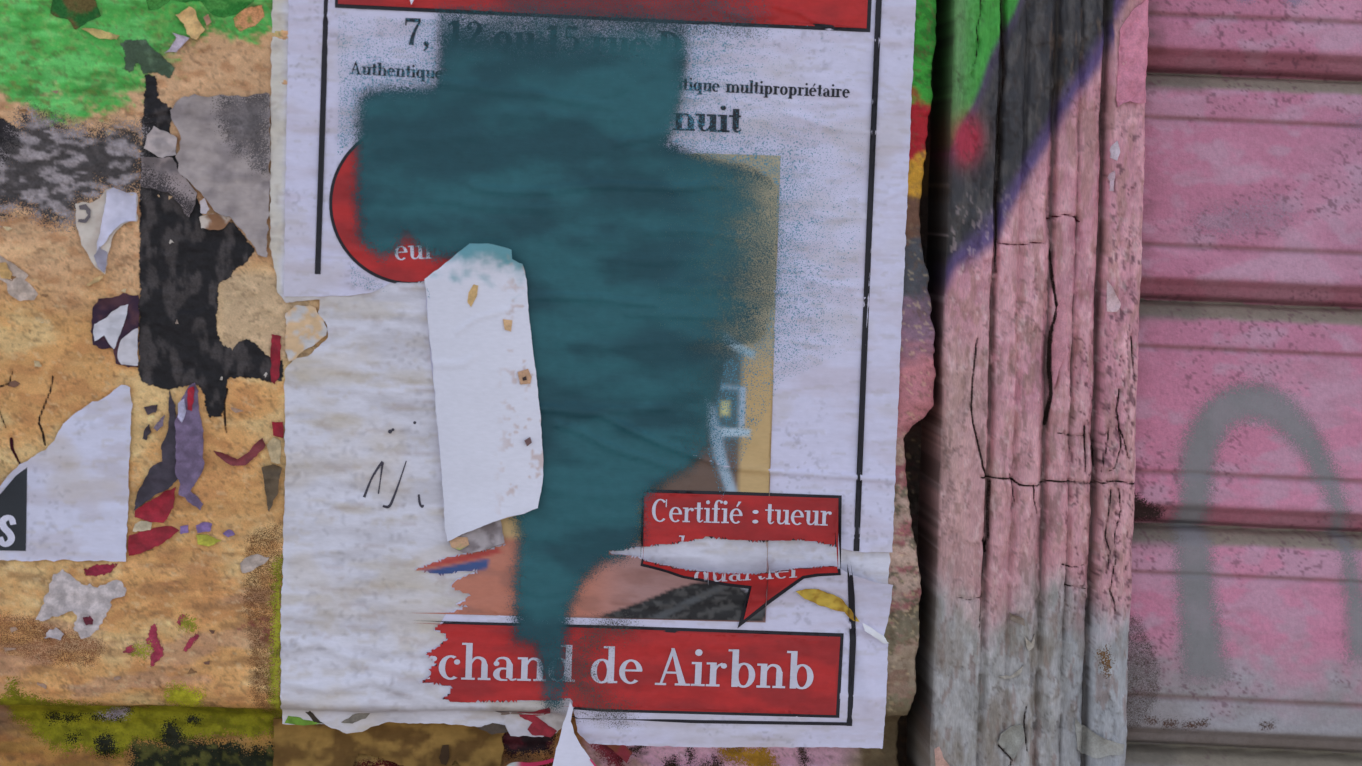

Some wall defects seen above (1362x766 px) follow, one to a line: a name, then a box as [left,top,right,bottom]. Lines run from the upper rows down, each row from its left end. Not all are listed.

spalling [50,0,120,40]
spalling [146,0,264,53]
peeling [0,256,38,301]
crack [960,0,1134,627]
peeling [264,334,281,384]
crack [0,371,54,464]